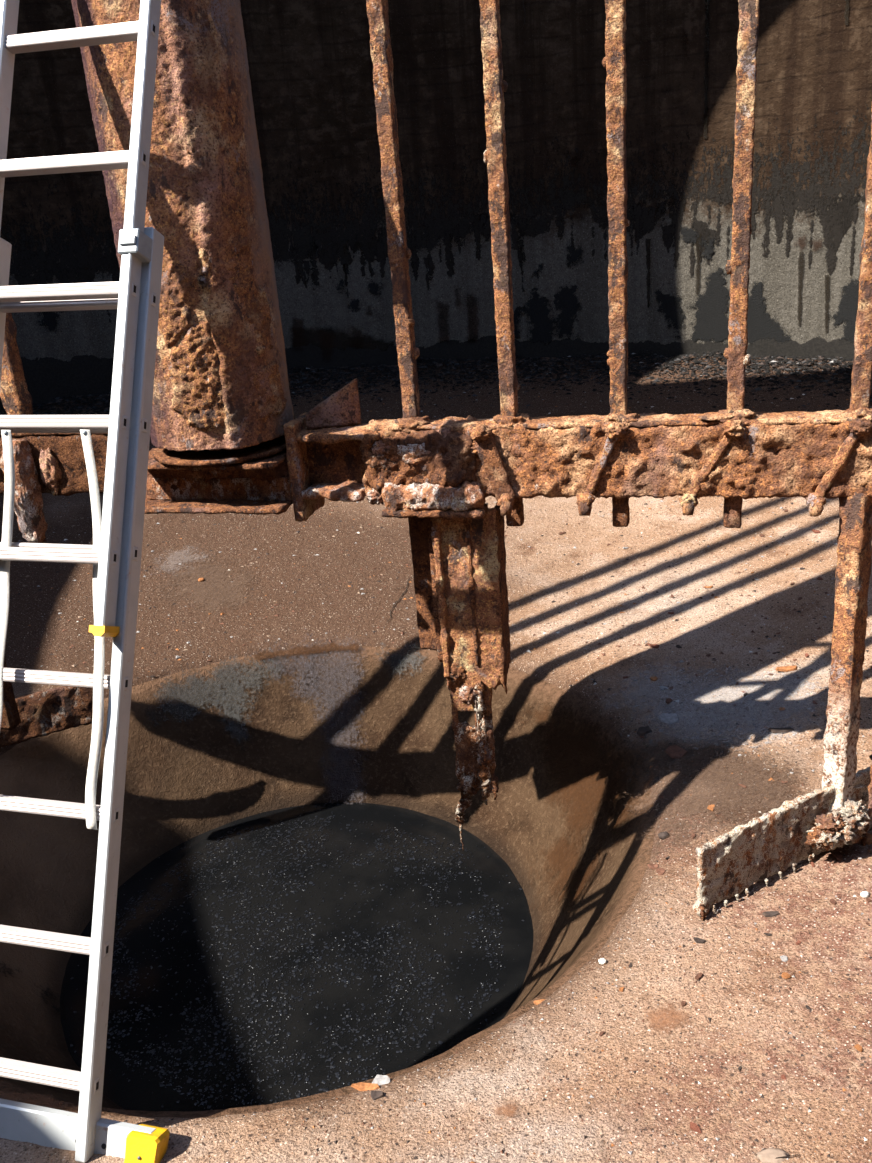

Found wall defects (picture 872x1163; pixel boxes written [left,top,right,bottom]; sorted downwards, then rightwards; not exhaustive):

leakage [0,175,120,285]
leakage [264,145,388,312]
leakage [401,138,491,291]
leakage [506,123,609,359]
leakage [625,0,735,357]
leakage [746,104,871,361]
leakage [21,355,114,406]
leakage [285,328,398,373]
leakage [416,335,498,364]